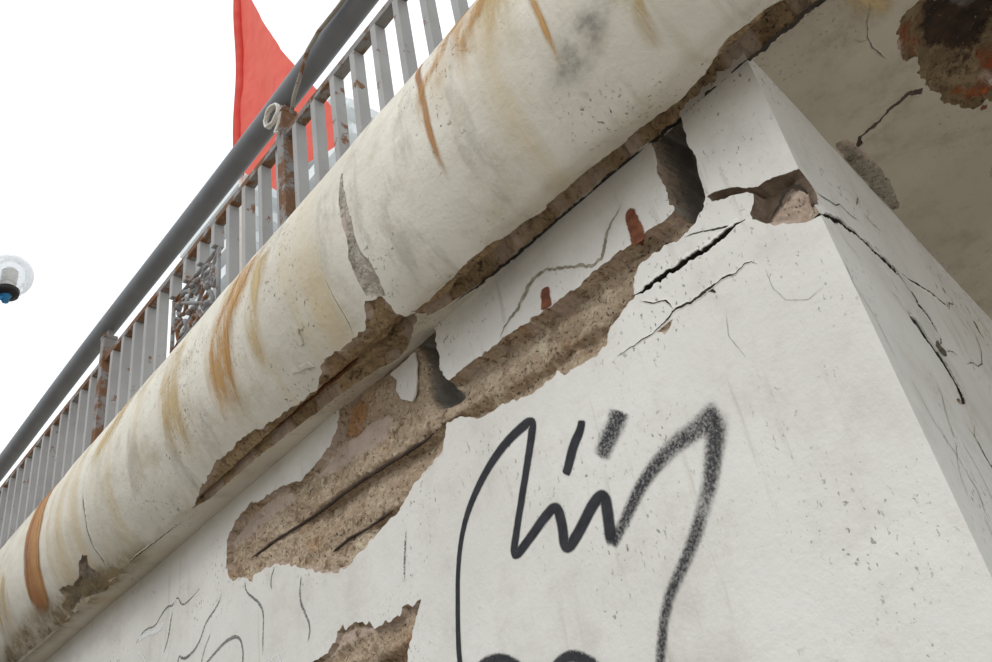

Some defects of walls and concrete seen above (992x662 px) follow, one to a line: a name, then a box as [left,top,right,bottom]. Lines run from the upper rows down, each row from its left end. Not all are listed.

corrosion [415,59,440,161]
corrosion [531,0,553,48]
crack [450,0,826,307]
spalling [836,139,900,210]
spalling [896,0,992,110]
corrosion [210,252,266,397]
spalling [192,0,821,582]
crack [500,209,619,339]
crack [617,214,822,356]
crack [814,193,992,533]
corrosion [25,481,60,611]
spalling [313,599,421,662]